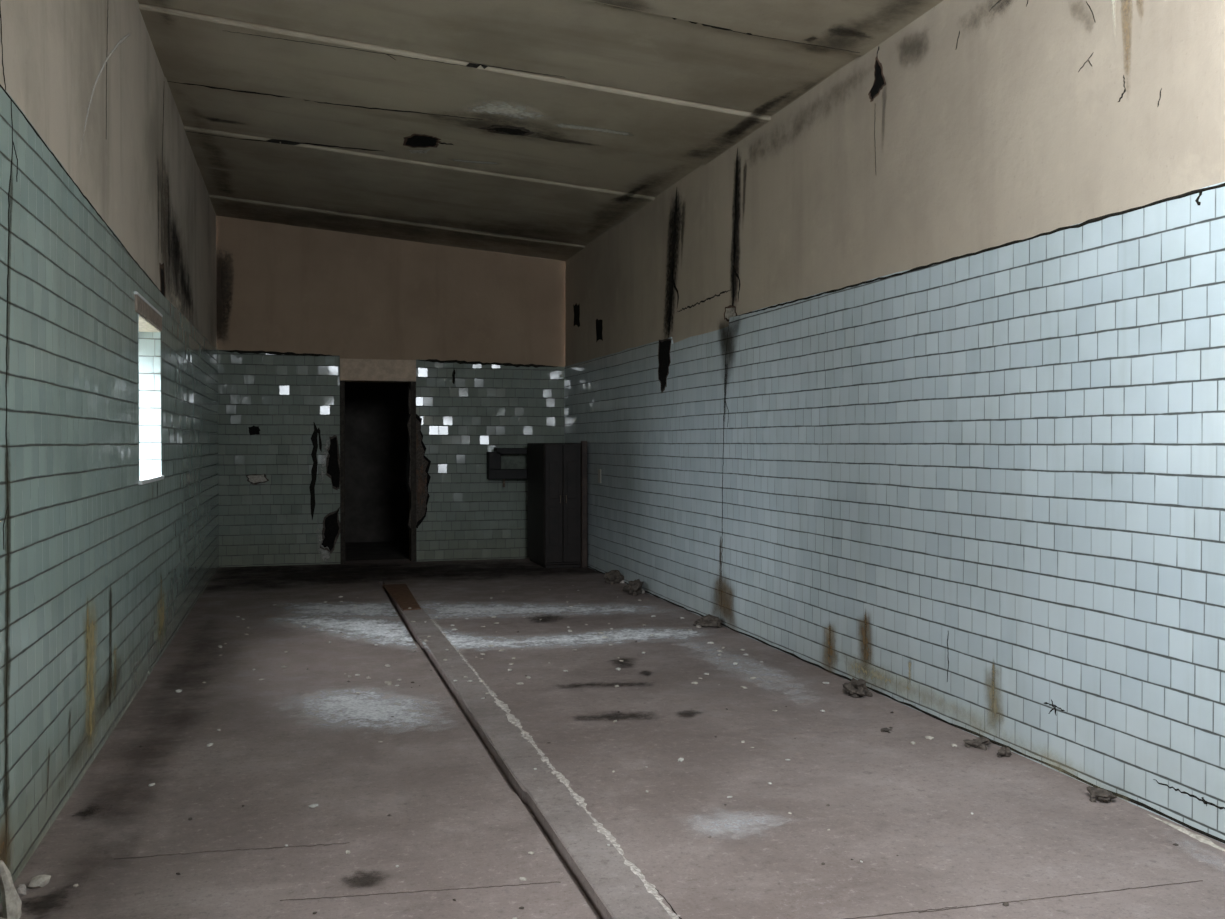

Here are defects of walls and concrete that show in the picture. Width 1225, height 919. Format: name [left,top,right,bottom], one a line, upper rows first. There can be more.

corrosion [1122,0,1131,71]
crack [0,6,165,576]
leakage [664,196,685,336]
leakage [730,160,746,304]
leakage [720,325,734,410]
spalling [322,435,340,490]
spalling [406,386,431,530]
spalling [320,507,341,560]
corrosion [715,539,733,622]
corrosion [860,612,871,671]
crack [588,566,1225,843]
crack [845,880,1203,919]